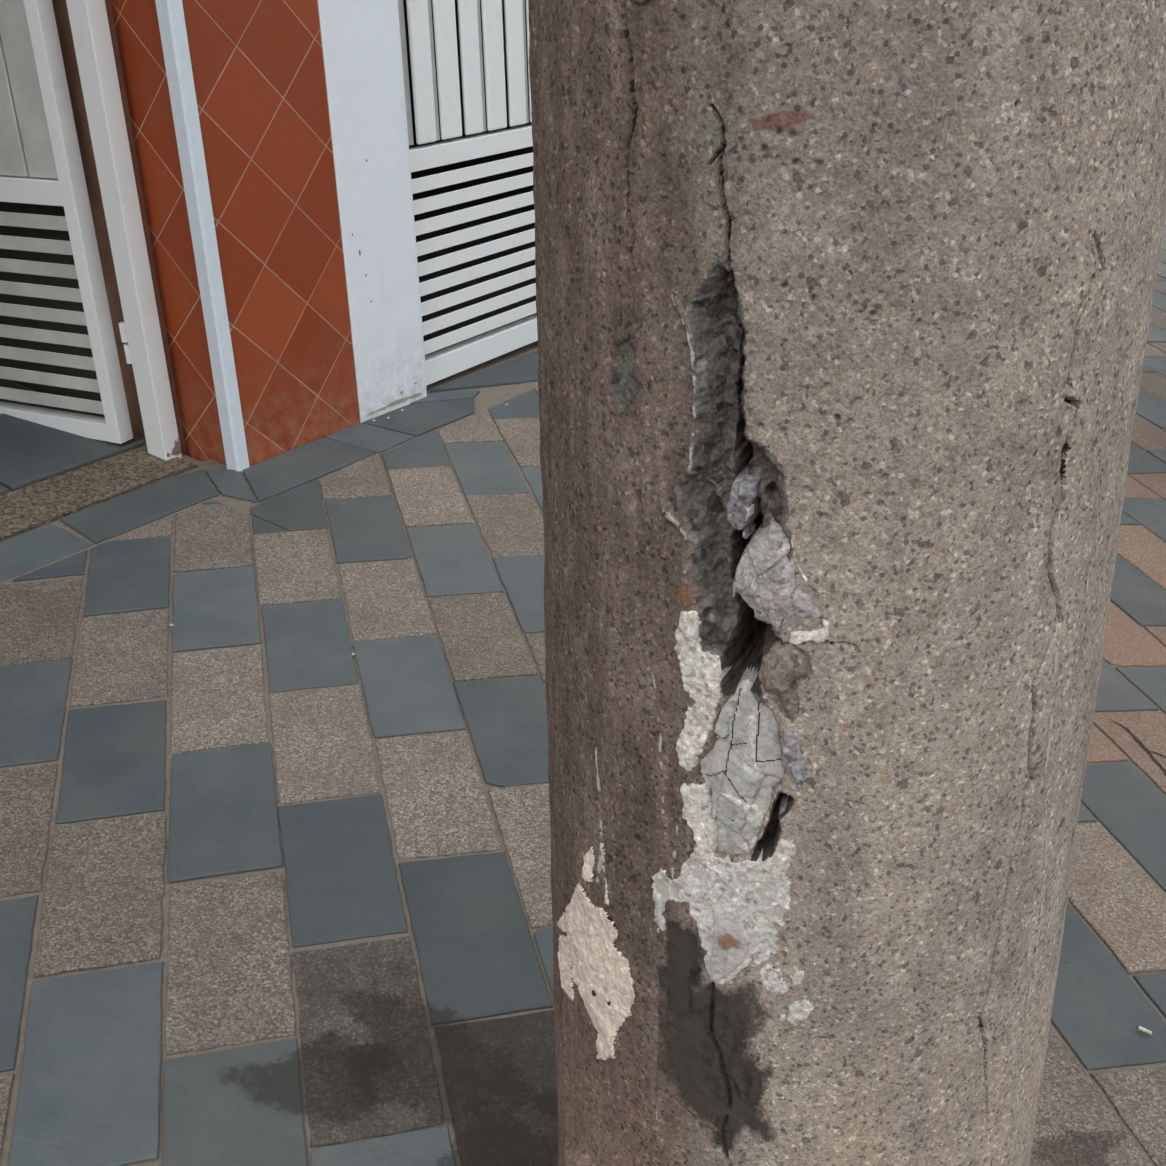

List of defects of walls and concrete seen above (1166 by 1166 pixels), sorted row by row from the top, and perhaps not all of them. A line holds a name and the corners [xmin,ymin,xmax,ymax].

crack [713,124,732,257]
crack [1059,442,1071,484]
peeling [789,619,829,645]
peeling [652,611,816,1026]
peeling [557,843,635,1061]